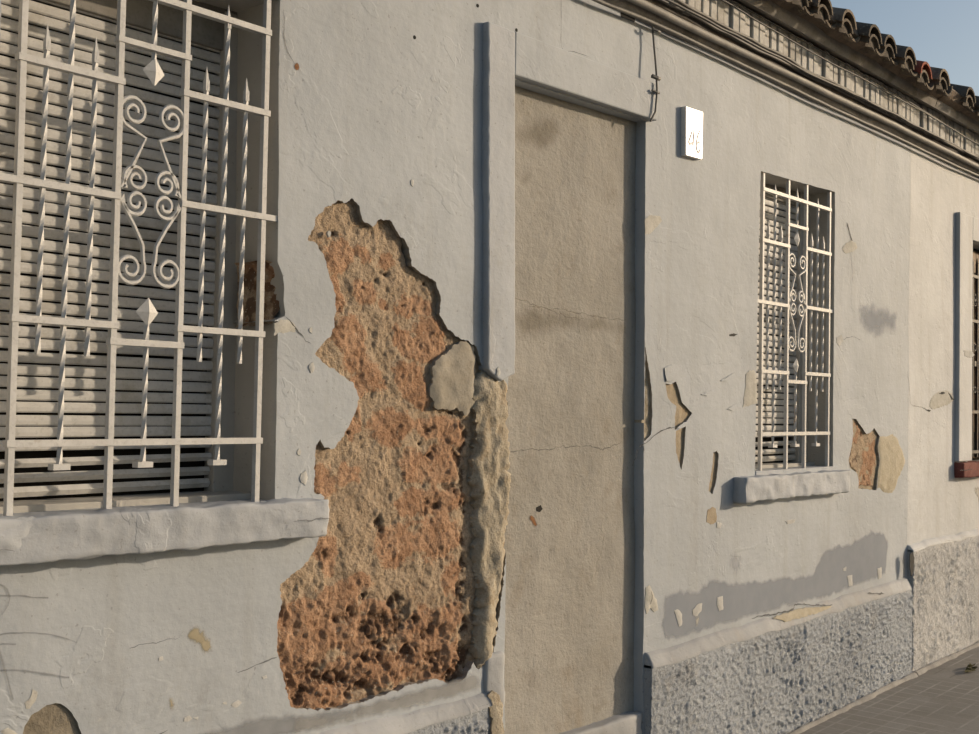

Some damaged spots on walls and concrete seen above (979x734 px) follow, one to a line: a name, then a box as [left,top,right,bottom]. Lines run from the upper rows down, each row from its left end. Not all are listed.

spalling [234,260,296,336]
peeling [664,364,690,465]
peeling [928,390,954,412]
spalling [277,200,511,710]
peeling [708,452,717,492]
spalling [849,419,905,493]
peeling [706,507,722,528]
spalling [1,689,80,734]